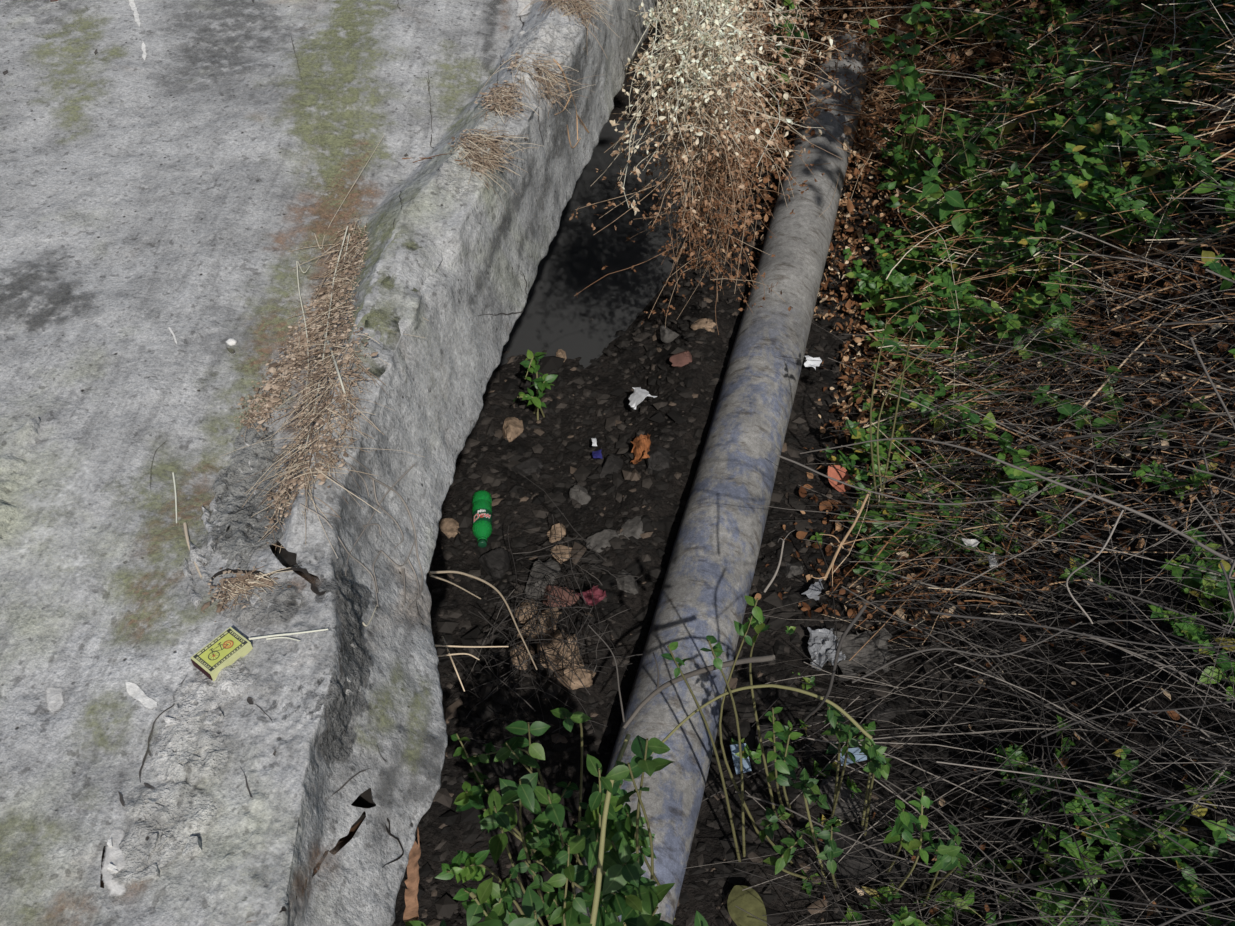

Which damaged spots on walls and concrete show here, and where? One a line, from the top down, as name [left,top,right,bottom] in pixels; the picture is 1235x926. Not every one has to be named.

crack [211,540,327,596]
crack [327,746,387,800]
crack [246,807,404,923]